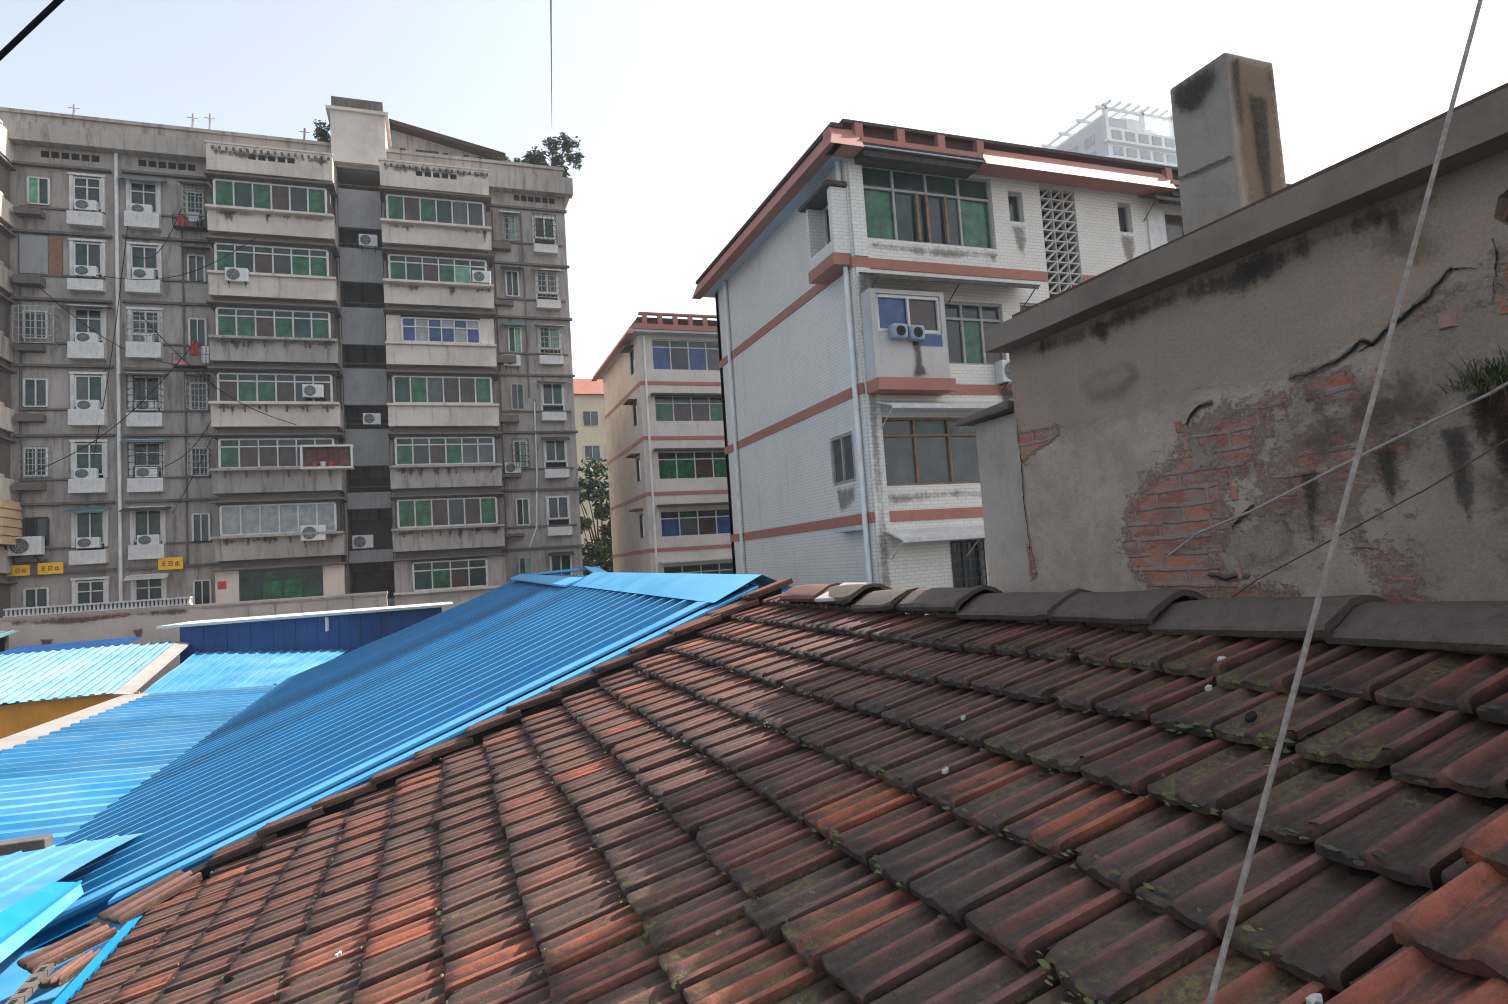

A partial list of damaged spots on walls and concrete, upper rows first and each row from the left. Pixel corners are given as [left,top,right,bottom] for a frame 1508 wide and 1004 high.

damp [1173,68,1214,112]
damp [1233,58,1283,202]
crack [1287,238,1504,382]
spalling [1018,424,1060,462]
spalling [1113,360,1444,602]
damp [1302,471,1316,541]
damp [1305,374,1445,502]
damp [1442,371,1508,518]